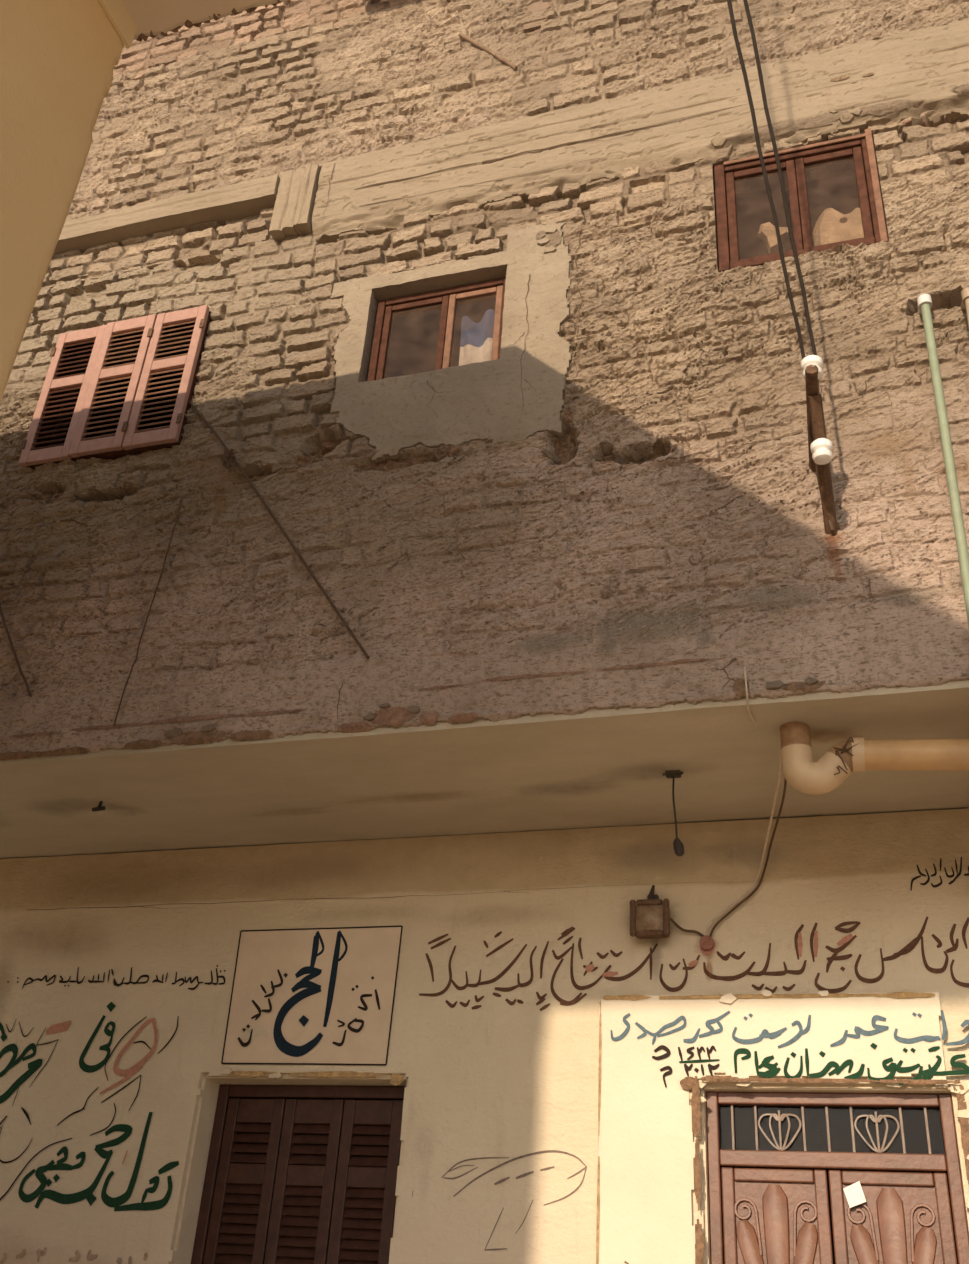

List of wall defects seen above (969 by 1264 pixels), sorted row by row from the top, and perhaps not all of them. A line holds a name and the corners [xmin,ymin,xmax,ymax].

crack [510,274,537,418]
spalling [354,445,460,472]